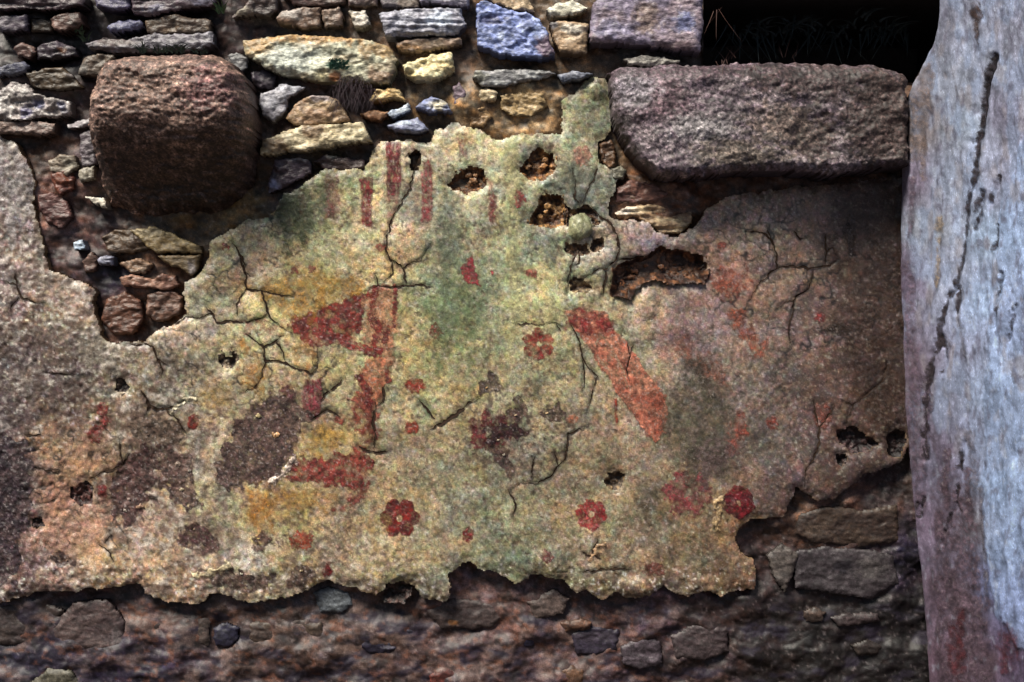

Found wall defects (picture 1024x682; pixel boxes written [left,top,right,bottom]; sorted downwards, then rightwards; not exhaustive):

crack [369,155,432,290]
spalling [447,166,488,195]
spalling [517,147,604,256]
crack [175,245,342,419]
spalling [569,277,592,293]
spalling [609,244,710,300]
crack [746,230,837,343]
crack [508,322,598,518]
spalling [836,373,934,467]
flaking render [45,550,76,568]
spalling [382,581,412,604]